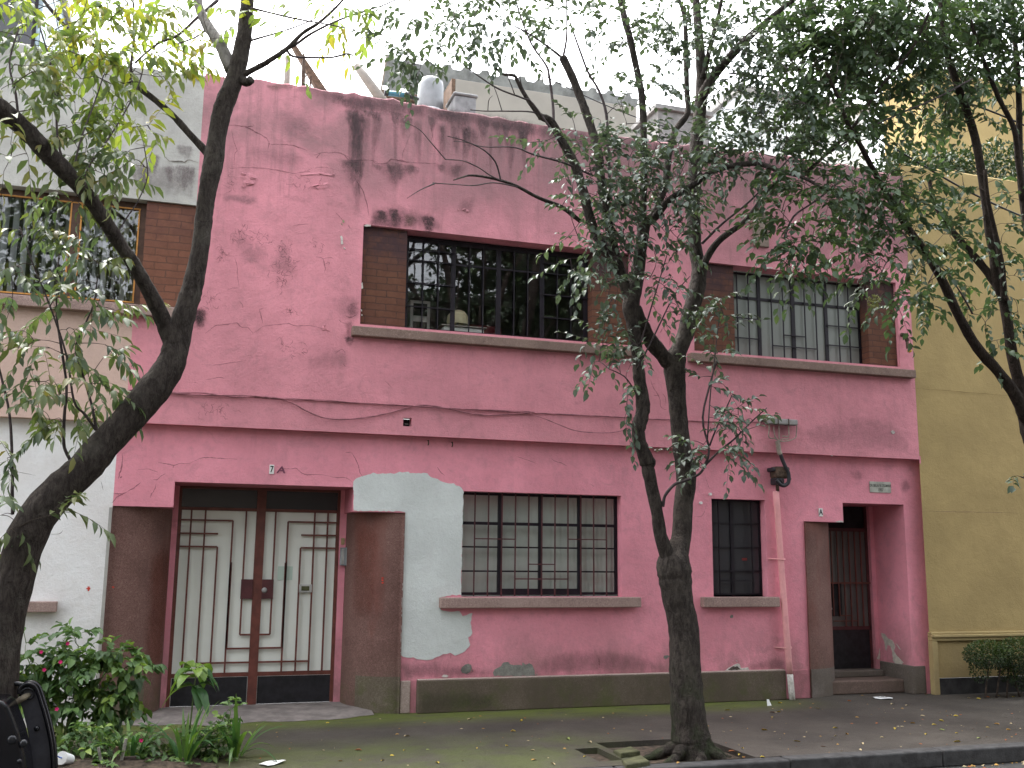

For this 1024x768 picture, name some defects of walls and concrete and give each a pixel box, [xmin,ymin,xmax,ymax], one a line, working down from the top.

crack [230,125,436,208]
crack [206,263,322,333]
crack [101,456,225,503]